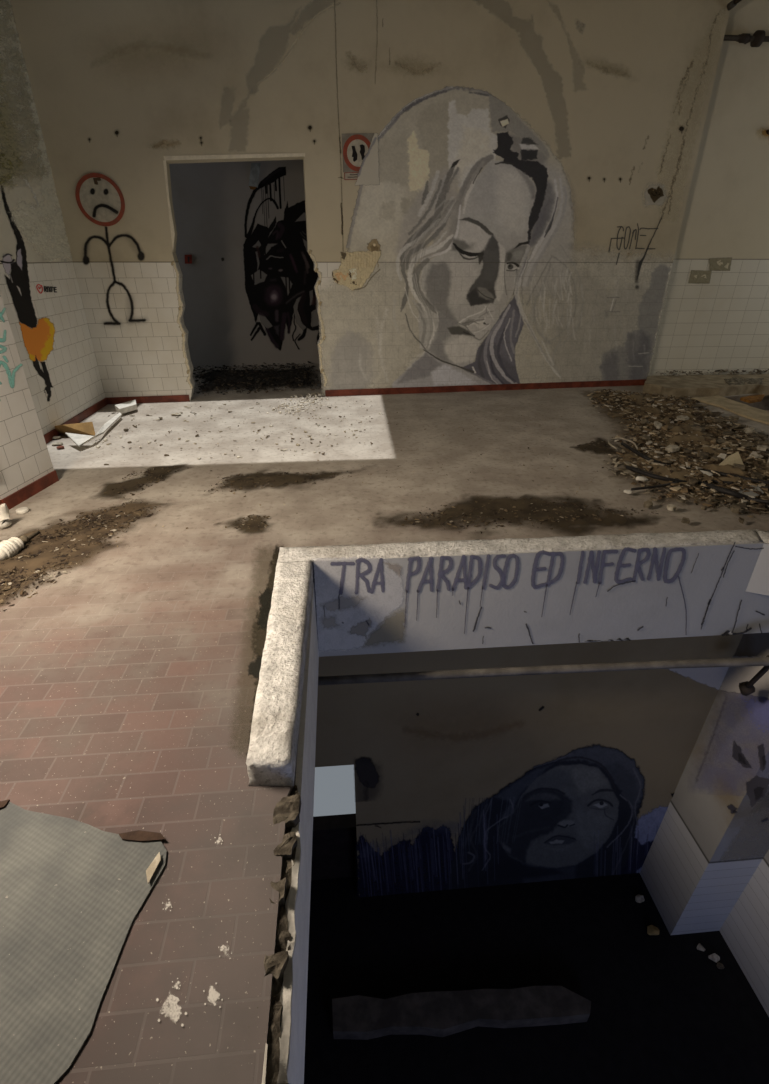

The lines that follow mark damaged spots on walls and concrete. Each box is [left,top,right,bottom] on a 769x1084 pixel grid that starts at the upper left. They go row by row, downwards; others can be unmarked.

spalling [308,239,381,387]
peeling [312,557,405,651]